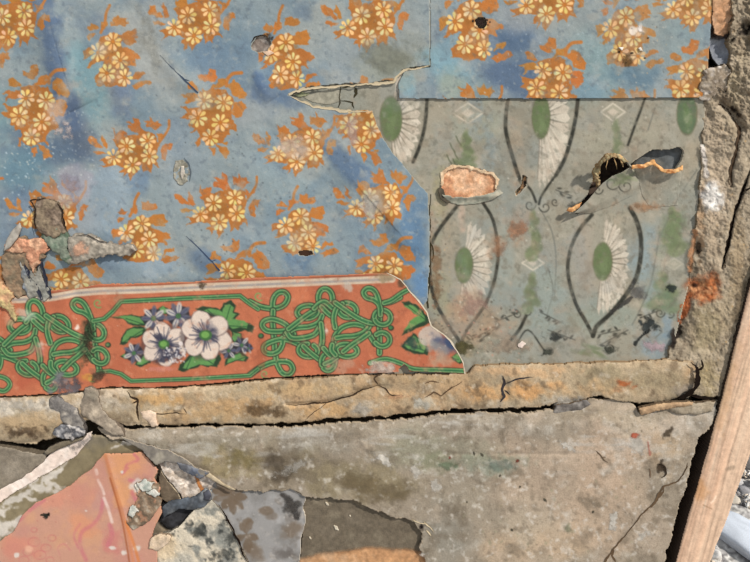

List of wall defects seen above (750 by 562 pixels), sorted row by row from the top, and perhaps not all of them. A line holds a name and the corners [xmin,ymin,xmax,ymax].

spalling [698,27,731,101]
spalling [438,164,503,205]
peeling [566,153,683,214]
crack [718,104,750,268]
spalling [4,223,51,272]
peeling [67,233,138,264]
corrosion [678,230,719,324]
crack [127,391,187,420]
peeling [121,436,236,551]
flaking render [300,497,422,560]
crack [604,463,688,562]